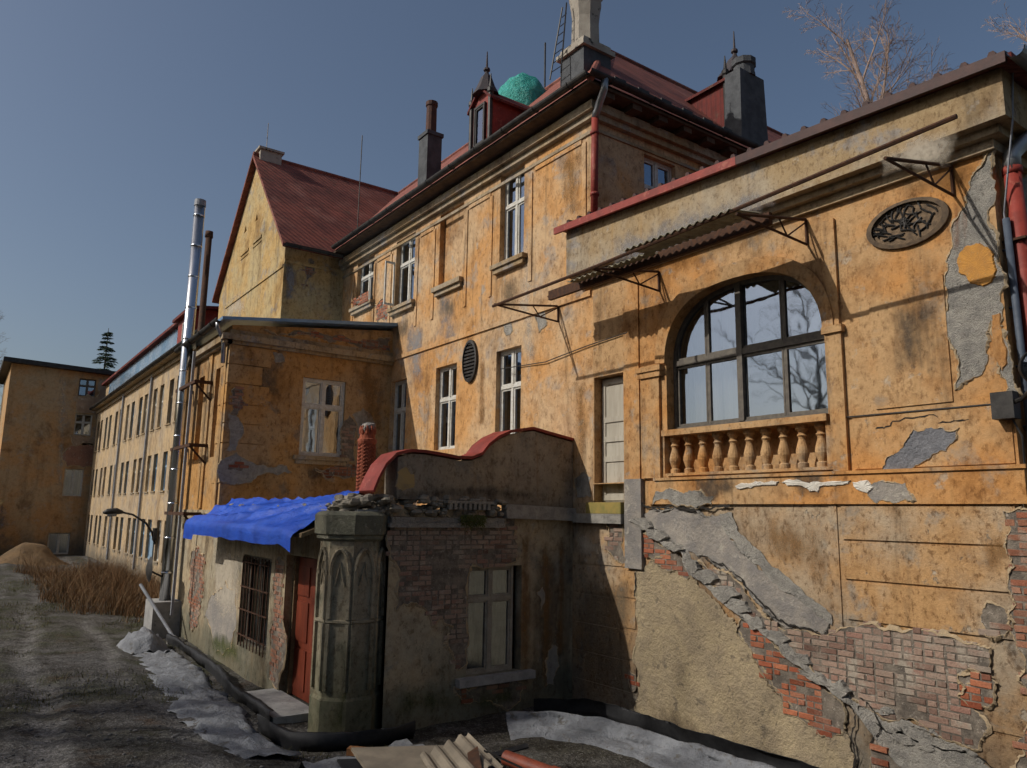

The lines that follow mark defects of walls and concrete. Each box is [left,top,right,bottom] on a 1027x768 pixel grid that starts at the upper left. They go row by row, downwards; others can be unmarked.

flaking render [944,146,1023,397]
flaking render [217,386,292,485]
flaking render [315,408,376,481]
flaking render [735,426,960,504]
flaking render [268,554,288,689]
flaking render [385,510,517,671]
flaking render [604,487,1027,768]
flaking render [453,681,526,712]
crack [850,697,993,768]